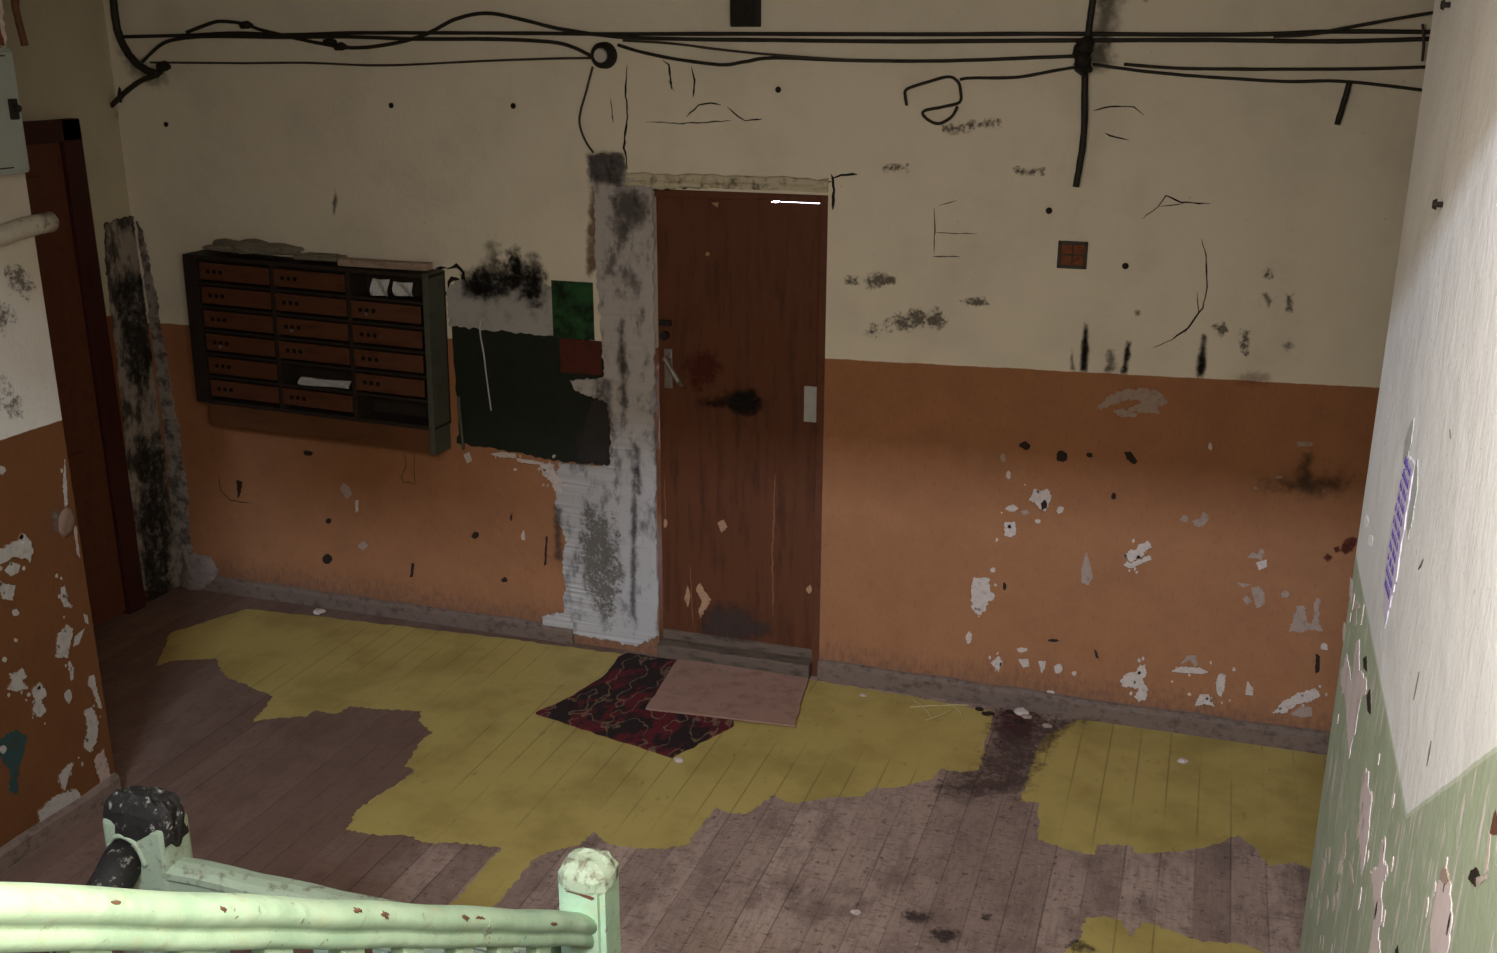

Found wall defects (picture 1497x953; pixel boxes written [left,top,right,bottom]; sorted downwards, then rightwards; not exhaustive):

peeling [0,532,34,616]
peeling [0,573,111,823]
spalling [52,460,80,558]
peeling [966,568,1007,644]
peeling [996,441,1064,542]
peeling [989,647,1076,676]
peeling [1119,657,1149,703]
peeling [1123,539,1153,574]
peeling [1170,655,1254,708]
peeling [1238,549,1371,759]
peeling [1310,753,1399,953]
peeling [1425,857,1488,953]